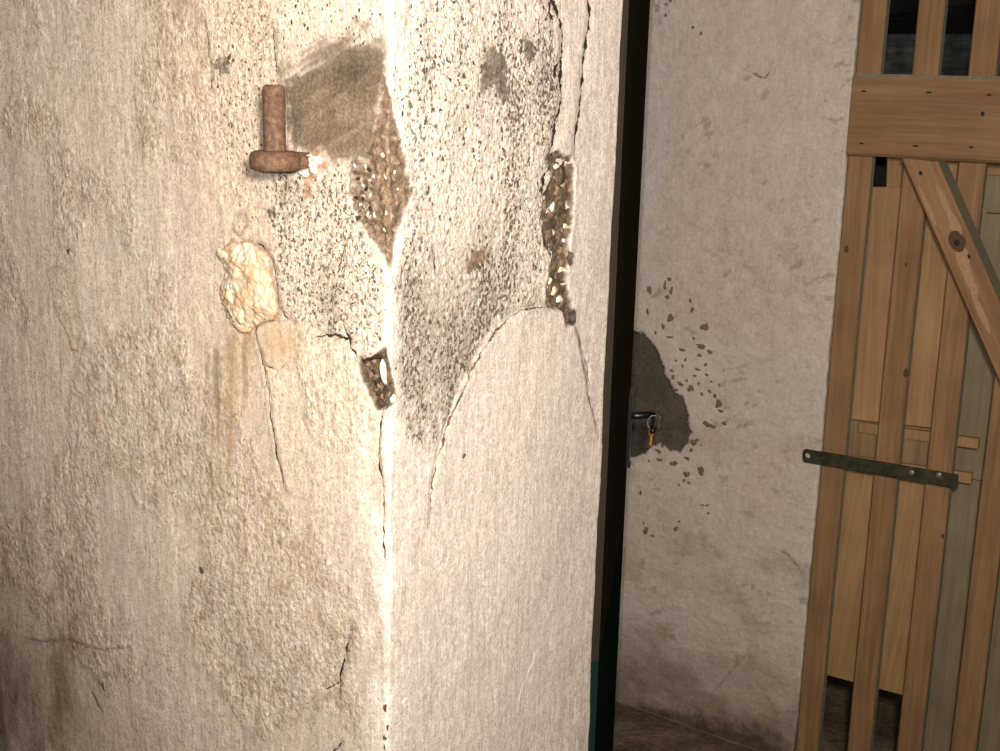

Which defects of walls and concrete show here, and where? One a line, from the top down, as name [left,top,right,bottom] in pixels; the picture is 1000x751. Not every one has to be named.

peeling [480,47,510,105]
peeling [519,38,535,62]
peeling [286,38,411,265]
peeling [466,248,486,273]
spalling [539,151,574,325]
crack [254,243,361,491]
spalling [360,349,397,410]
crack [429,307,545,524]
crack [577,335,596,426]